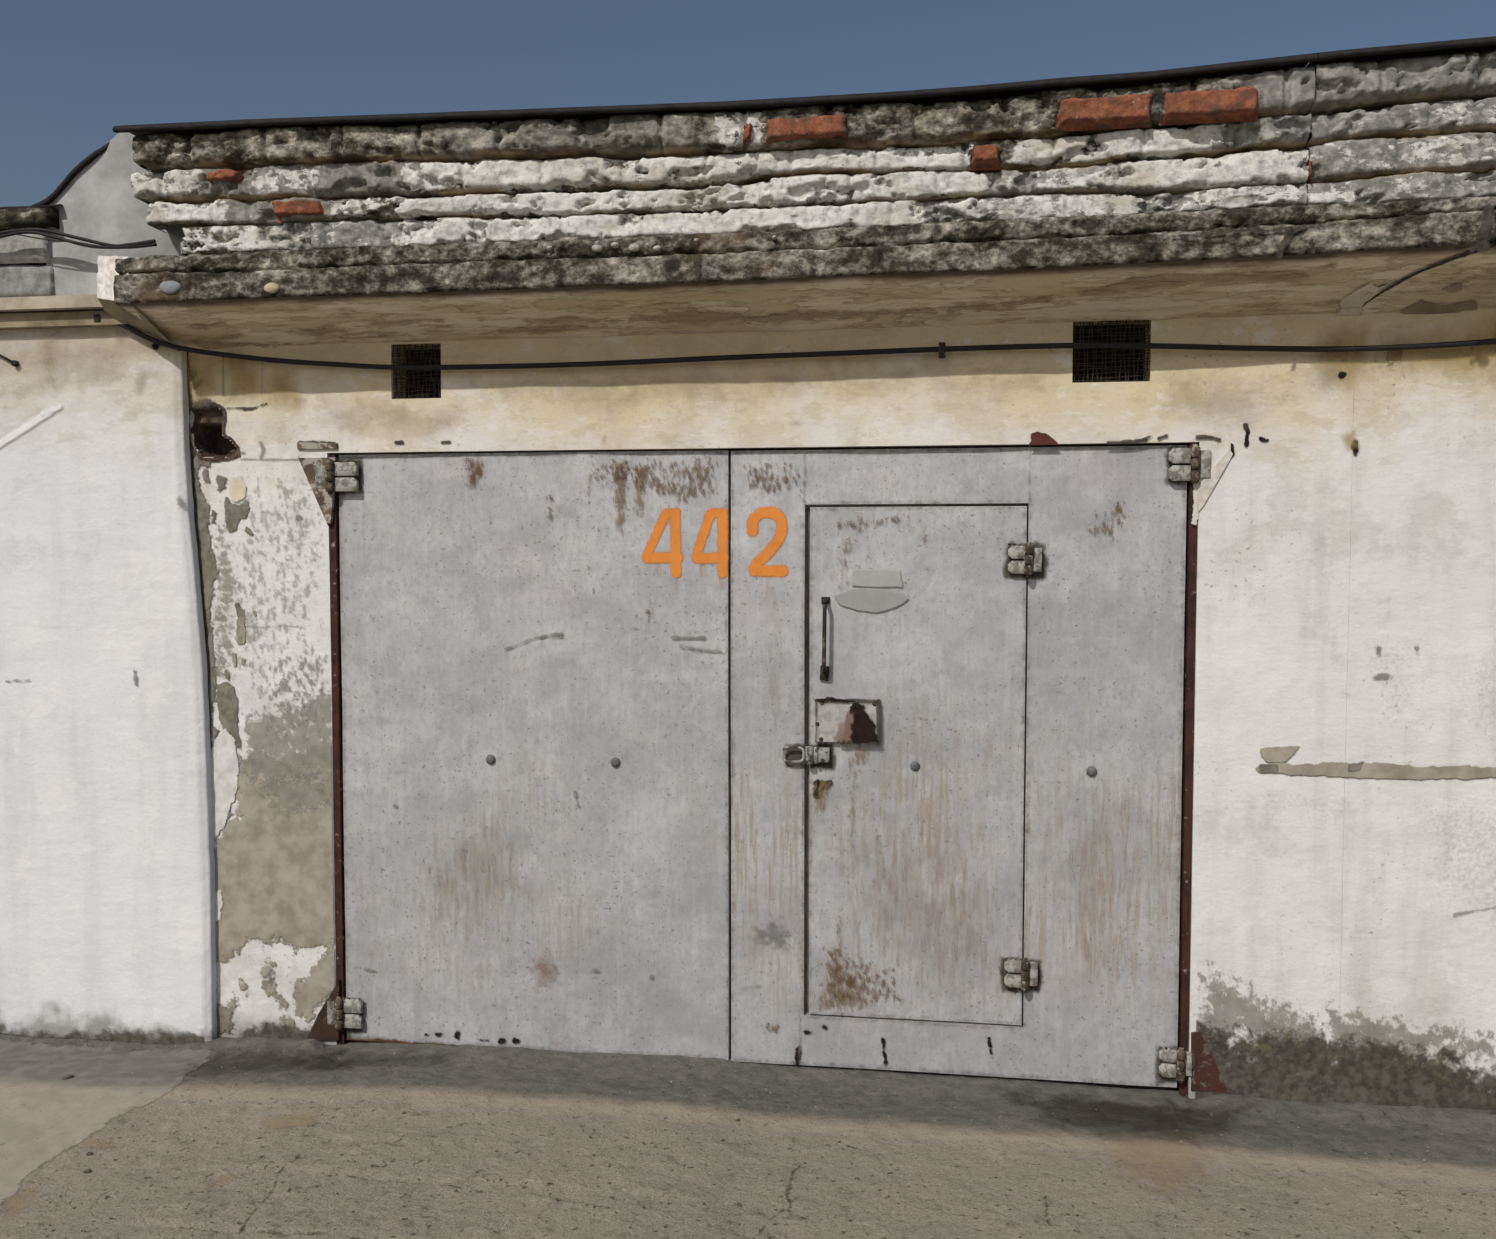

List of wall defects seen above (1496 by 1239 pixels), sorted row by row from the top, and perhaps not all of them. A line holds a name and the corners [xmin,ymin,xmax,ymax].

corrosion [588,458,717,532]
flaking render [189,402,335,1039]
corrosion [813,779,833,811]
corrosion [817,697,879,774]
spalling [1256,746,1496,780]
corrosion [794,915,901,1066]
water stain [1195,1024,1496,1111]